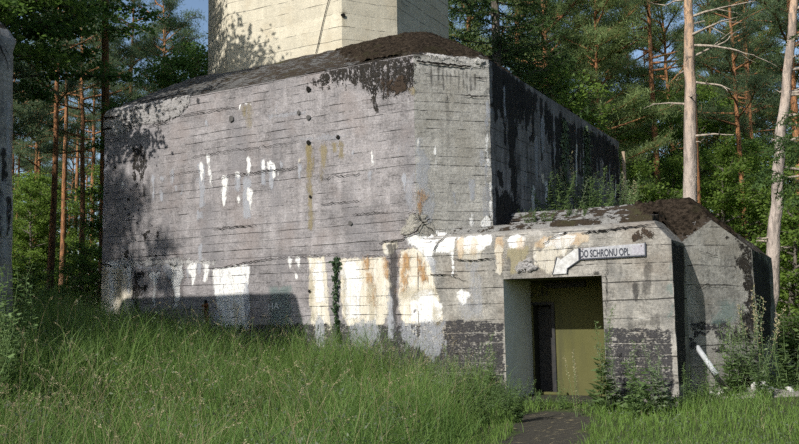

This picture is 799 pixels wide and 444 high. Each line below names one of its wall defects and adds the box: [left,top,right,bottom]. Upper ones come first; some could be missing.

leakage [306,52,429,113]
leakage [0,101,12,236]
leakage [121,145,182,224]
leakage [406,62,620,275]
leakage [101,230,209,324]
crack [364,212,448,257]
crack [430,258,492,281]
leakage [725,236,772,351]